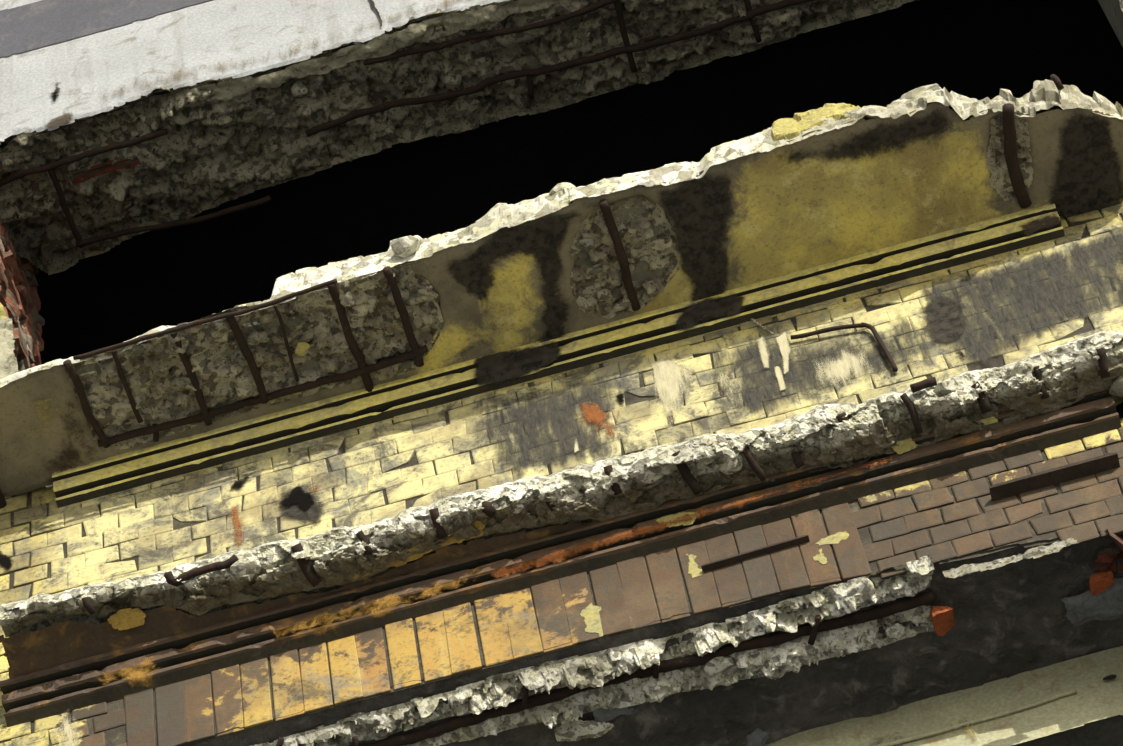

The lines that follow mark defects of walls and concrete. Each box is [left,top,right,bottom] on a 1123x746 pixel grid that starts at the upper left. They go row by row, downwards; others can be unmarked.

spalling [0,0,1123,452]
water stain [448,213,580,386]
water stain [659,175,1123,413]
water stain [280,484,325,523]
water stain [487,378,625,478]
spalling [0,330,1123,637]
rust [582,403,619,436]
water stain [653,357,692,416]
rust [492,458,891,577]
rust [106,661,153,686]
rust [275,593,405,637]
spalling [251,538,1080,746]